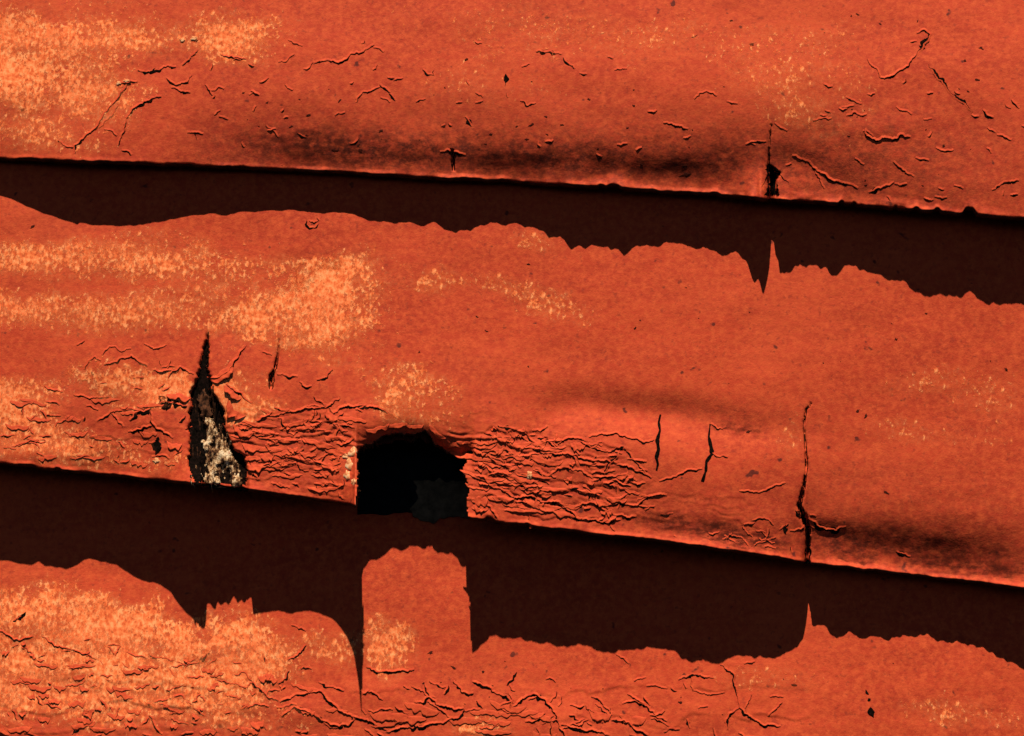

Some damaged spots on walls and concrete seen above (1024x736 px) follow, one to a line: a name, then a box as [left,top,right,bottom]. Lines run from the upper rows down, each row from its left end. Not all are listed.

crack [745,28,1024,201]
peeling [5,398,51,431]
crack [0,340,388,500]
spalling [91,332,640,523]
crack [474,414,728,538]
crack [708,403,846,563]
peeling [0,712,50,735]
peeling [10,641,159,736]
peeling [163,703,264,736]
peeling [201,667,318,709]
peeling [301,708,350,736]
peeling [370,685,557,736]